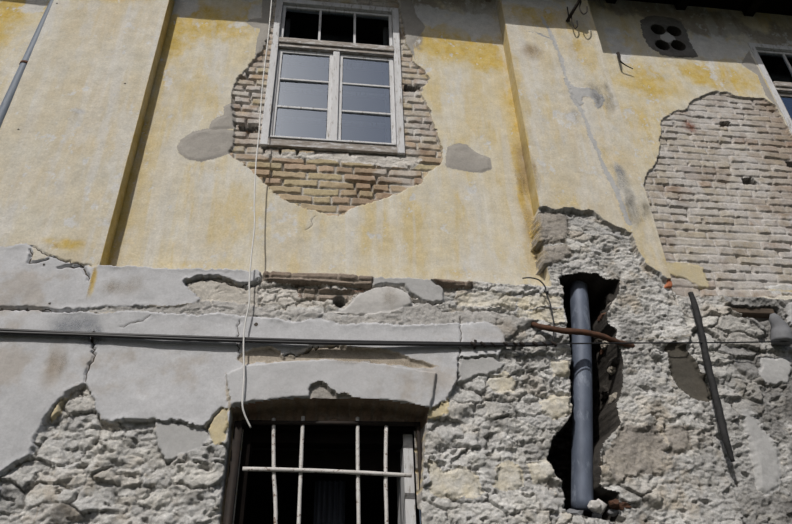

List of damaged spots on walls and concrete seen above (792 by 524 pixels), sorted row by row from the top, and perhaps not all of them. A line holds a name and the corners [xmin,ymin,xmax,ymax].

spalling [229,0,443,216]
crack [29,247,92,281]
peeling [261,286,358,315]
peeling [372,90,792,524]
crack [85,342,96,382]
spalling [237,345,439,368]
spalling [309,381,353,399]
peeling [0,373,233,524]